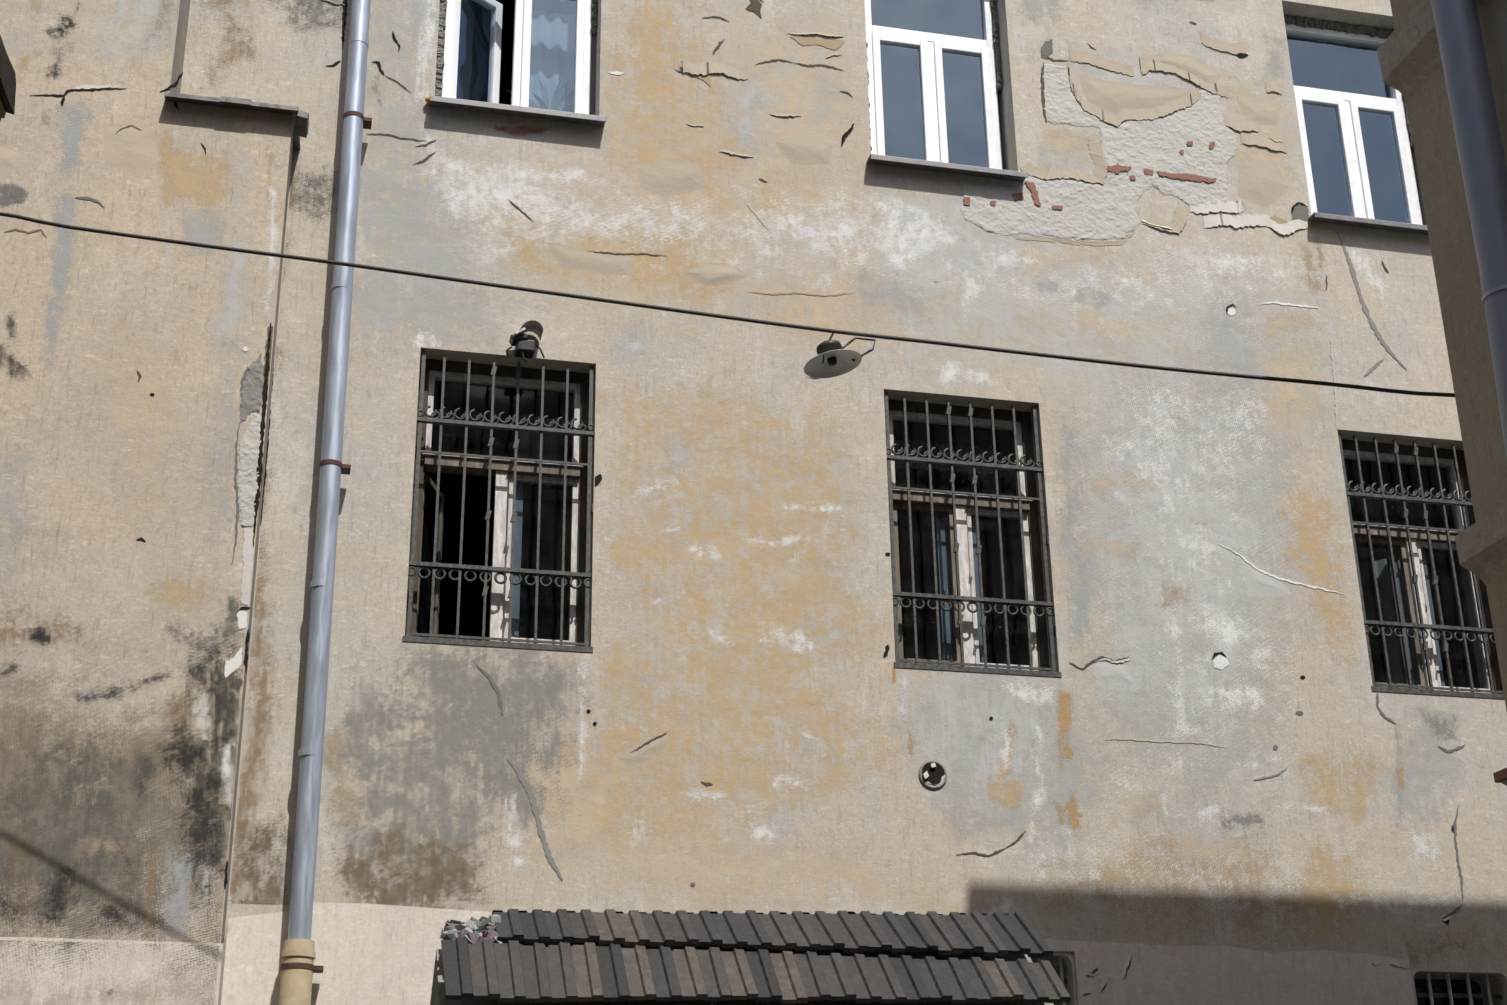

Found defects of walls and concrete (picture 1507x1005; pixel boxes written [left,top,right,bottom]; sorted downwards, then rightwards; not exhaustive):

spalling [746,0,764,18]
crack [326,0,411,93]
spalling [787,31,844,59]
peeling [675,57,748,87]
crack [30,72,183,110]
spalling [960,39,1317,246]
spalling [237,326,274,629]
water stain [319,0,1495,971]
spalling [224,648,242,678]
crack [1069,656,1129,670]
crack [631,732,667,753]
crack [957,832,1024,856]